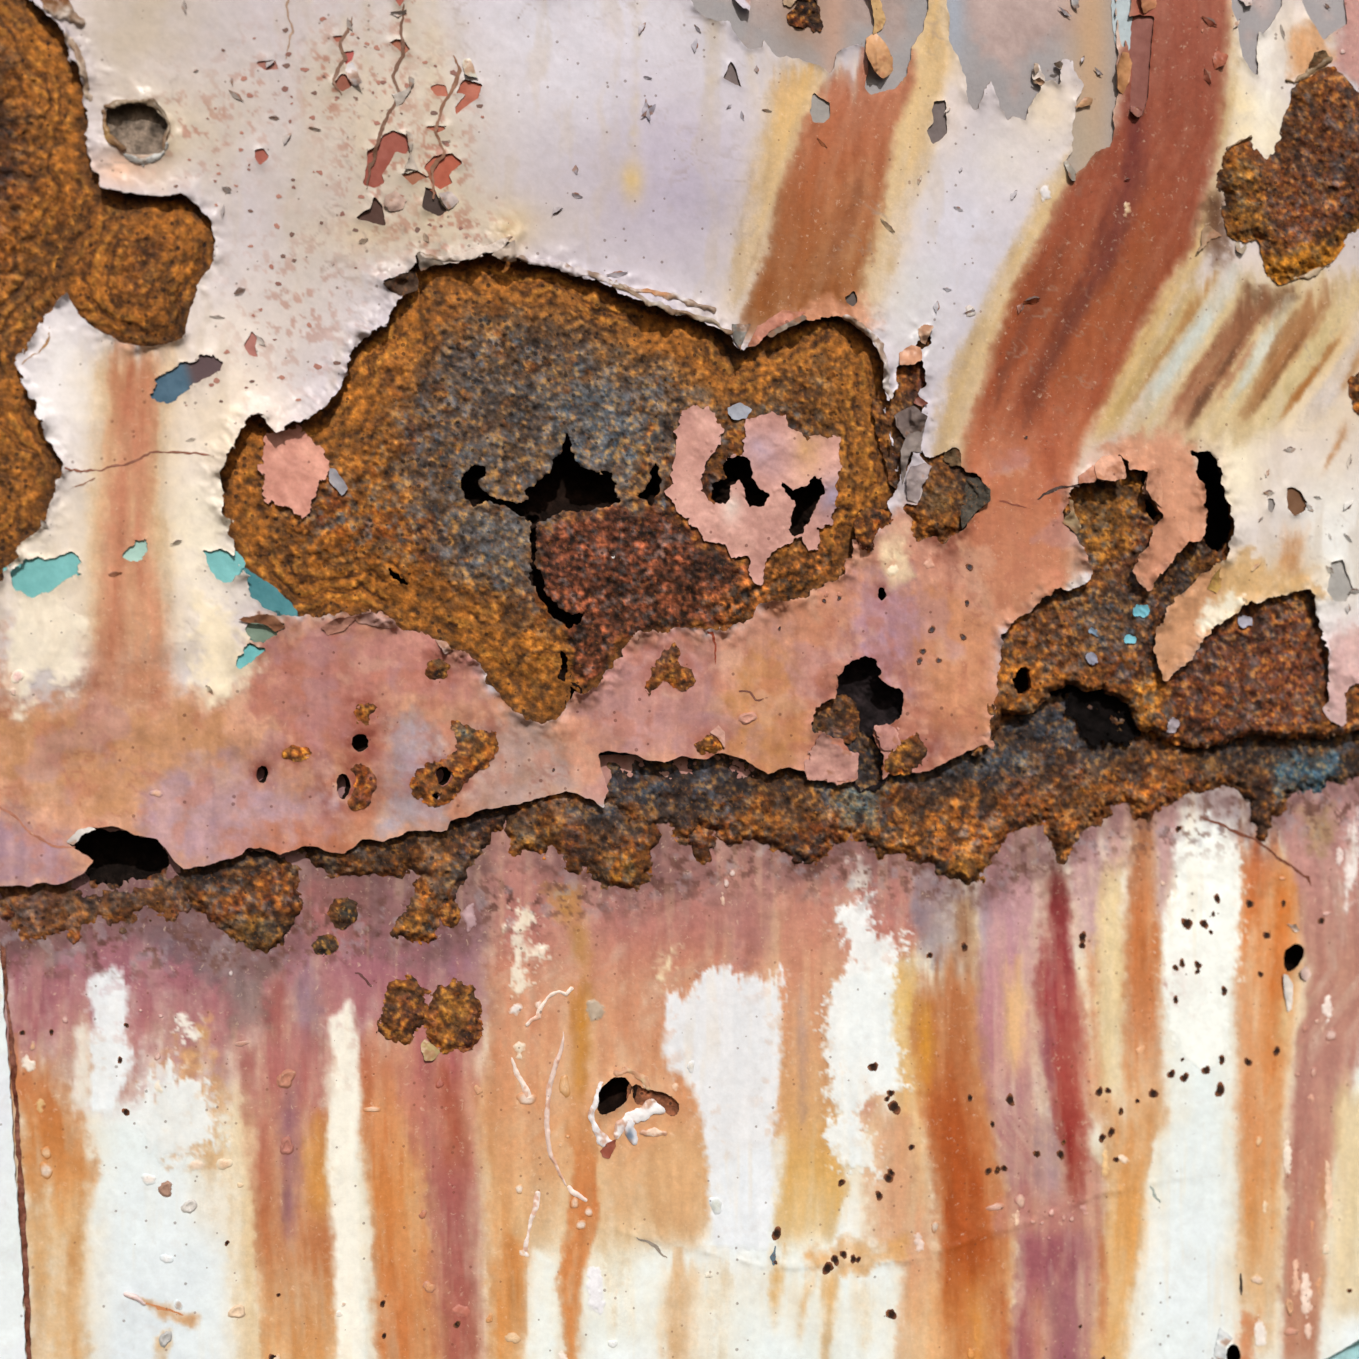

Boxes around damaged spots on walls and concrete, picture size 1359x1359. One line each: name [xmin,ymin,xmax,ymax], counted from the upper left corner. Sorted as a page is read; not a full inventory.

peeling [257,33,484,233]
peeling [691,0,928,95]
peeling [927,100,947,144]
peeling [947,0,1157,181]
peeling [150,308,263,406]
rust [0,0,662,954]
rust [219,0,1359,806]
peeling [3,552,81,598]
peeling [203,549,298,669]
peeling [804,732,859,785]
rust [0,795,1184,1359]
rust [603,693,1359,1359]